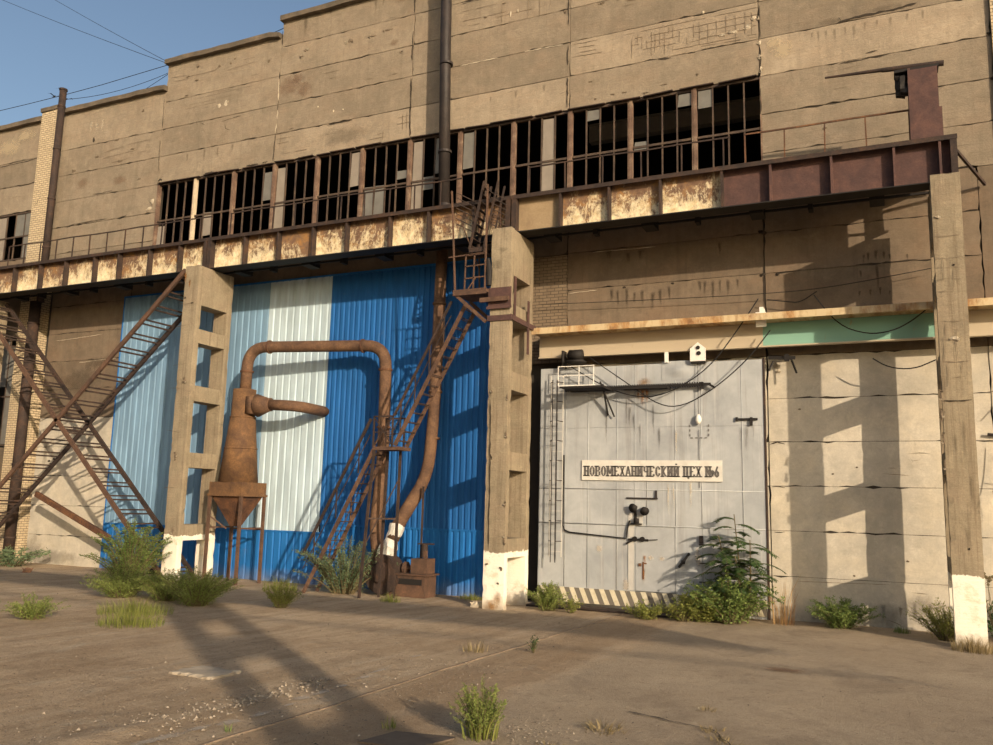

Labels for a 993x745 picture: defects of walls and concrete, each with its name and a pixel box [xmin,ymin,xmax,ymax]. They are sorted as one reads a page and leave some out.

crack [363,0,415,131]